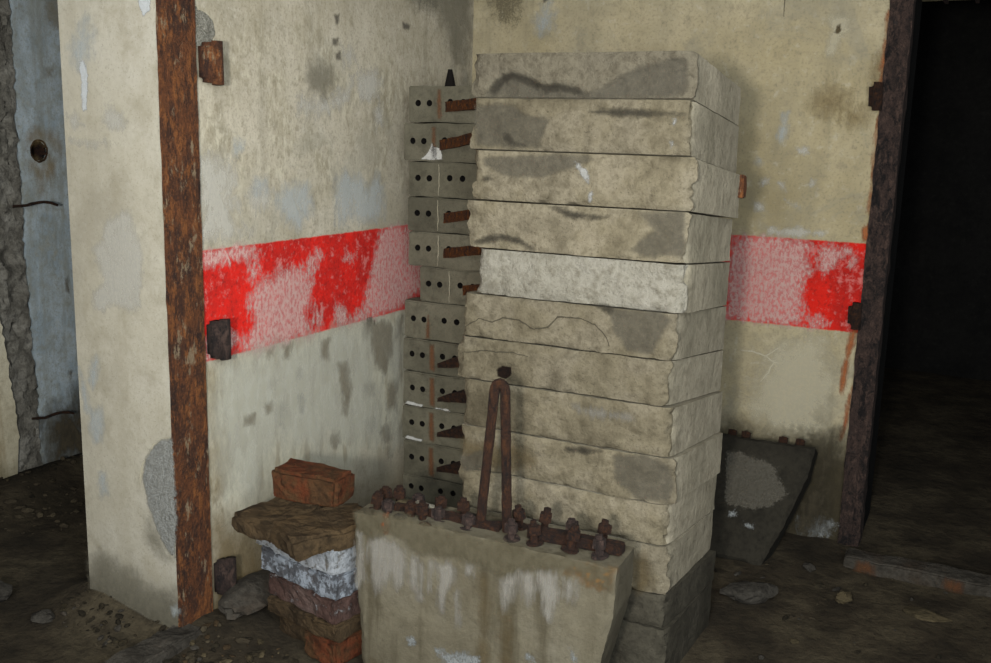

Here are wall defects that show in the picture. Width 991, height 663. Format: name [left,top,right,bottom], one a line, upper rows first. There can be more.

spalling [0,0,75,472]
rust [840,330,857,439]
peeling [143,439,177,555]
water stain [355,513,611,623]
water stain [435,649,480,663]